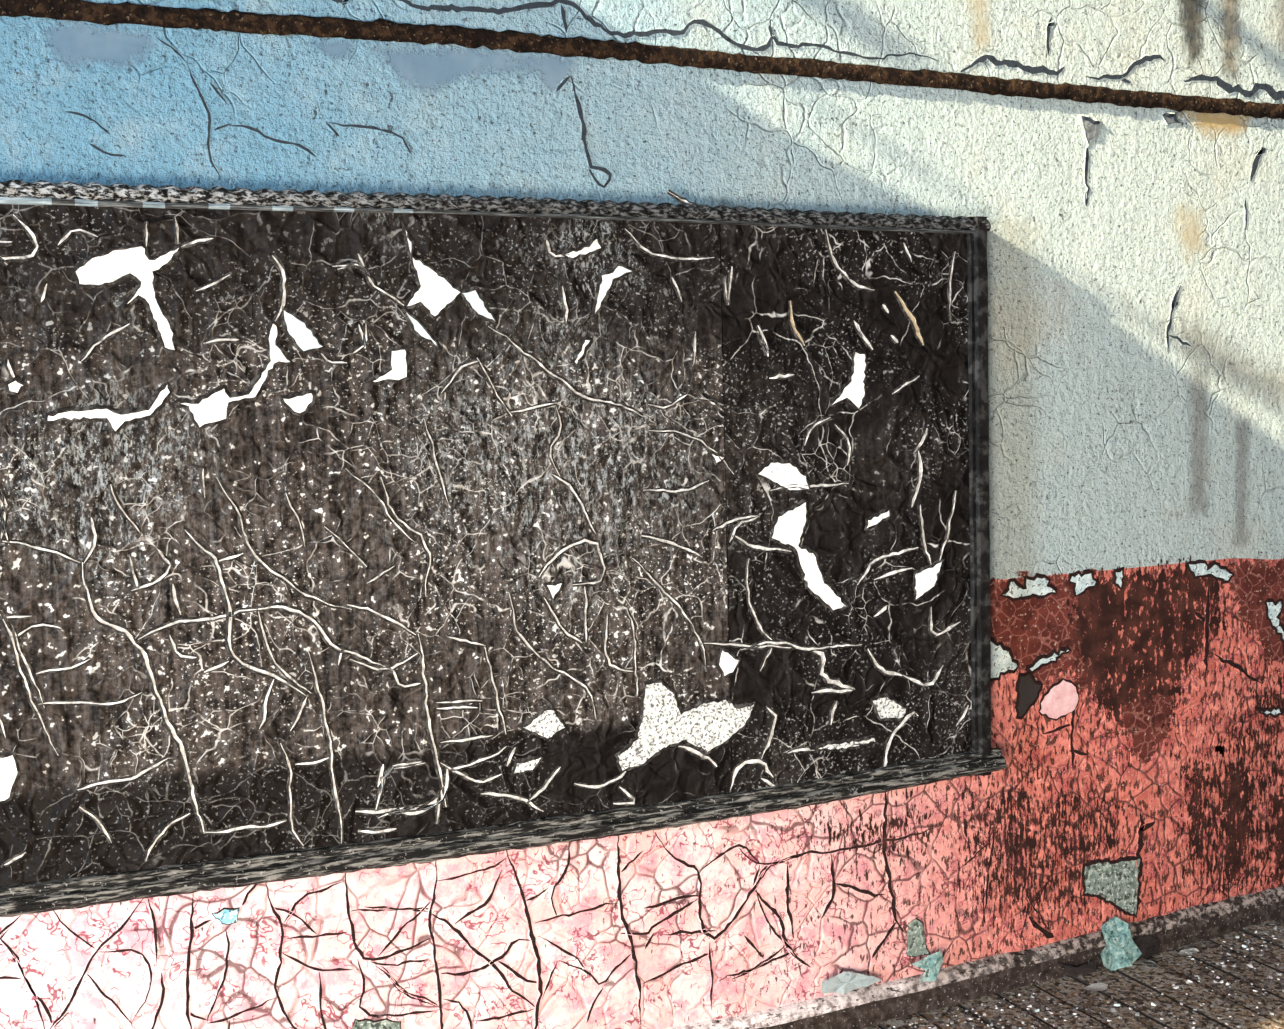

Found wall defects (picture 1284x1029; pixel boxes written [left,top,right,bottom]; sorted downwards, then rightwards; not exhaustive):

crack [389,0,1284,102]
rust [1179,0,1203,64]
rust [1219,0,1238,77]
rust [1198,113,1239,132]
crack [0,213,98,303]
peeling [72,242,182,353]
peeling [364,221,498,385]
crack [824,229,957,396]
peeling [755,459,850,613]
crack [0,323,960,1029]
peeling [615,678,755,773]
peeling [797,551,1284,946]